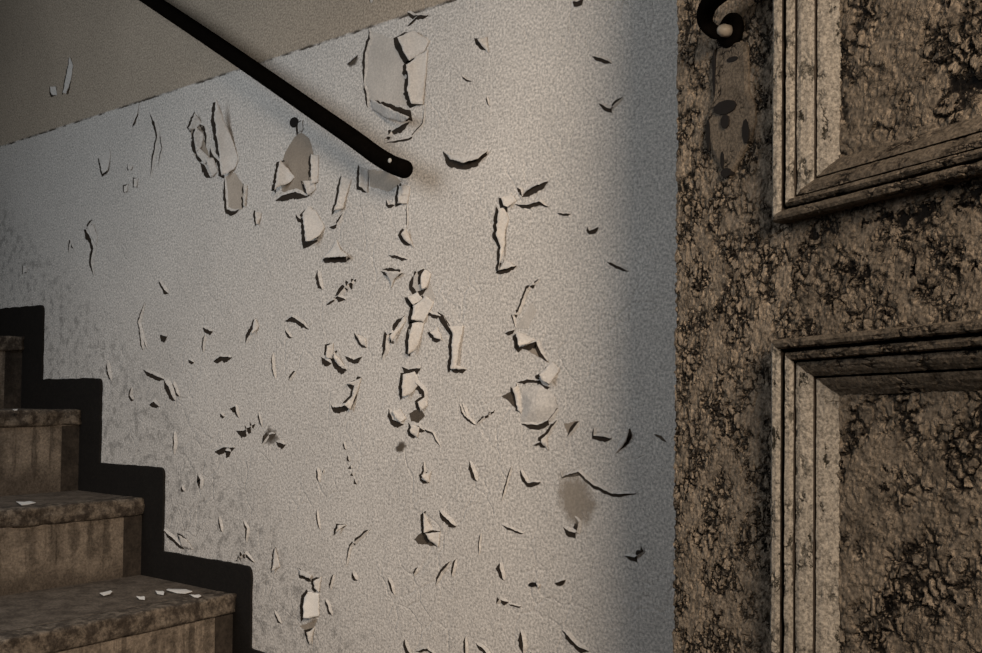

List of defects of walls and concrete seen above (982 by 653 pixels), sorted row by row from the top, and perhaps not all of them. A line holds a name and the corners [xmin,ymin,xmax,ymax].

peeling [366,11,430,143]
peeling [187,99,262,225]
peeling [271,117,325,249]
peeling [332,165,414,248]
peeling [321,333,367,413]
peeling [381,268,467,447]
peeling [502,279,560,414]
peeling [419,461,431,484]
peeling [534,421,580,450]
peeling [414,511,440,547]
peeling [563,516,582,538]
peeling [297,568,321,645]